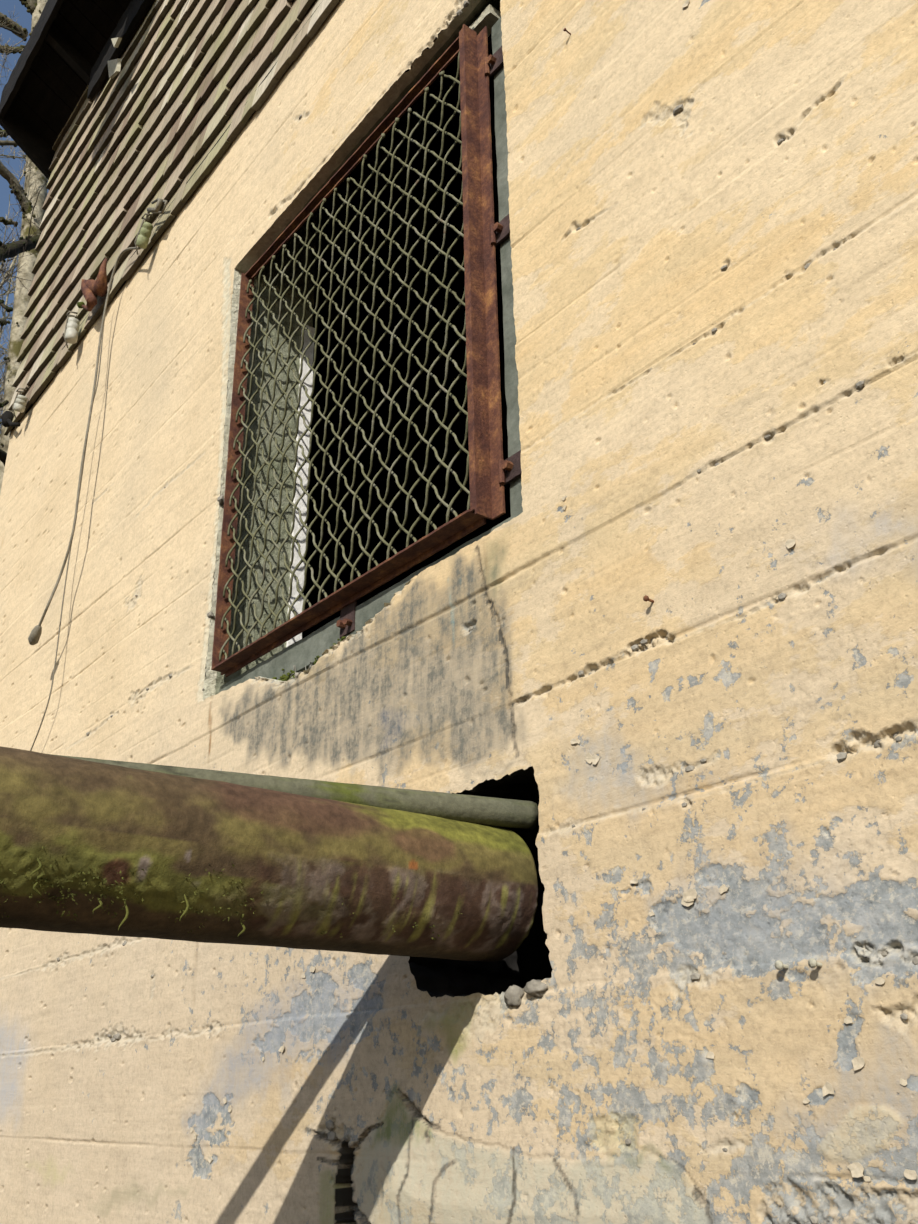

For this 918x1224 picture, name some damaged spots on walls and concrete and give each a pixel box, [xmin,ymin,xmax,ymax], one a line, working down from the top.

spalling [267,0,469,220]
spalling [637,97,695,139]
crack [474,545,530,757]
spalling [825,719,918,763]
peeling [622,864,918,1005]
peeling [832,992,918,1071]
peeling [734,1085,764,1107]
peeling [803,1081,837,1104]
crack [304,1089,457,1224]
spalling [754,1162,918,1224]